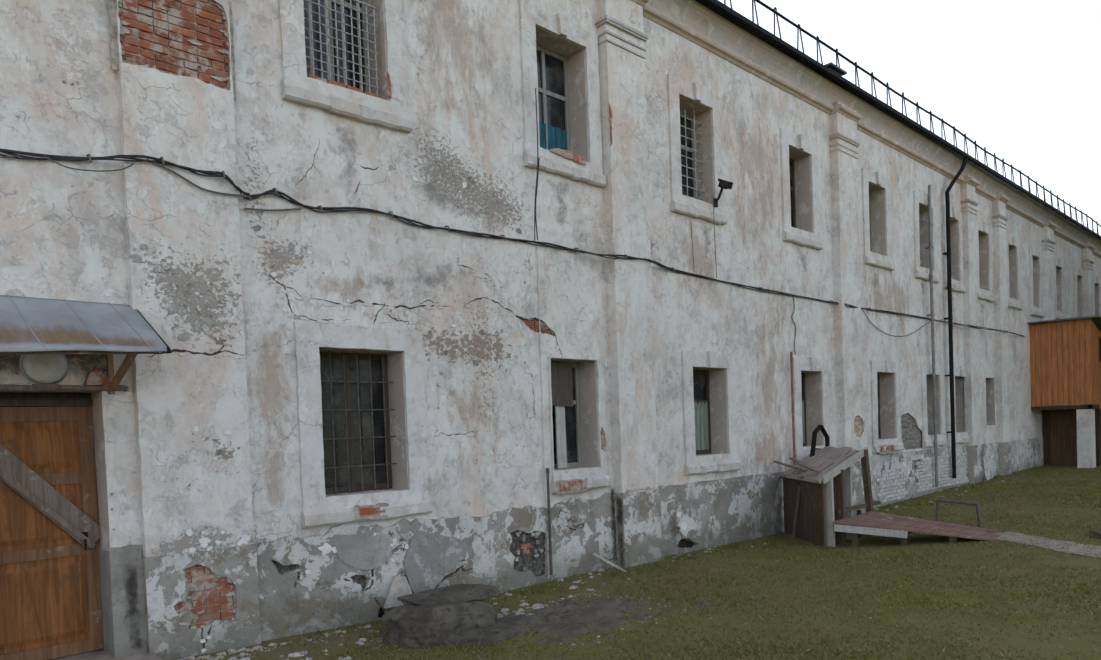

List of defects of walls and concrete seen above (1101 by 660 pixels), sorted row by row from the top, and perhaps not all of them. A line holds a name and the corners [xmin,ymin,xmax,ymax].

spalling [108,0,236,101]
flaking render [237,130,324,293]
flaking render [406,124,534,236]
rust [0,329,146,345]
flaking render [128,235,241,351]
crack [262,265,516,324]
flaking render [422,269,556,455]
flaking render [873,413,969,503]
flaking render [982,438,995,481]
spalling [151,522,261,630]
spalling [509,530,548,577]